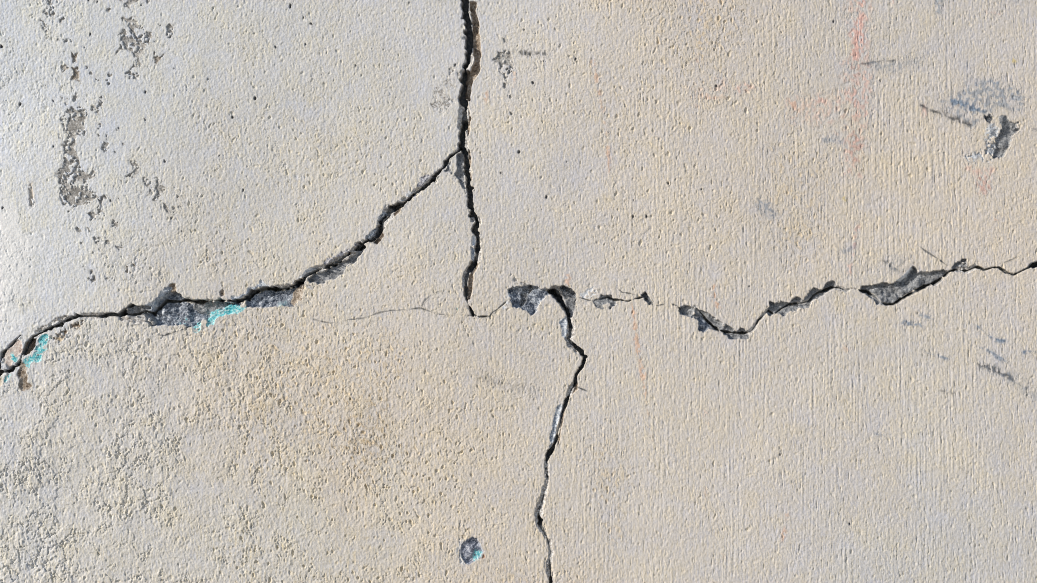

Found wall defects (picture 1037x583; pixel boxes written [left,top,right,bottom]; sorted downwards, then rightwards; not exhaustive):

flaking render [27,180,36,209]
flaking render [38,0,367,333]
crack [0,0,508,377]
flaking render [963,113,1021,165]
flaking render [454,535,486,566]
crack [534,244,1037,583]